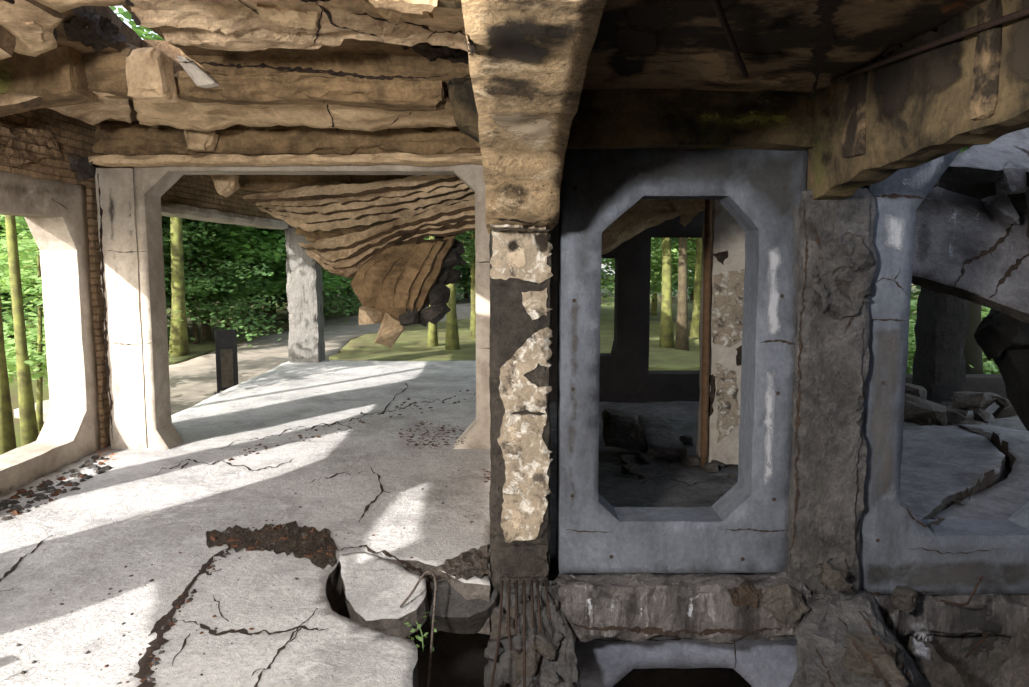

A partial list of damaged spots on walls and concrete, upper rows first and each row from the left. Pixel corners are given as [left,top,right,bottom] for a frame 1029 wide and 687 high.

crack [125,0,152,29]
damp [485,18,575,64]
damp [608,0,741,77]
damp [872,14,962,120]
damp [917,156,943,184]
damp [889,219,901,247]
crack [955,201,1029,298]
peeling [490,224,553,543]
peeling [708,250,745,443]
crack [900,425,1009,554]
crack [0,535,52,592]
crack [133,546,329,687]